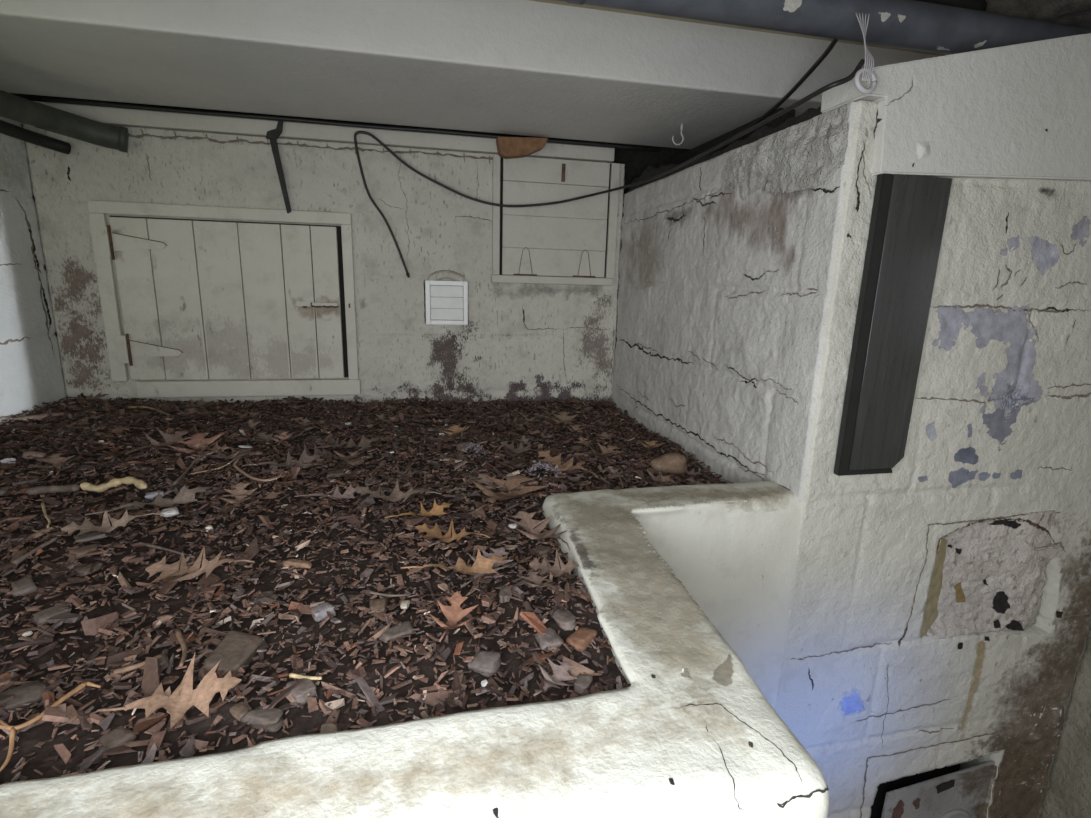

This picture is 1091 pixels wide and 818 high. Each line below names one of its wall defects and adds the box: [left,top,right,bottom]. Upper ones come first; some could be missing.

peeling [783,0,802,12]
peeling [879,12,906,23]
crack [626,167,733,254]
crack [811,77,913,238]
crack [0,189,54,356]
water stain [49,257,110,394]
water stain [353,294,615,405]
crack [521,305,798,490]
peeling [932,304,1050,488]
crack [672,703,829,810]
water stain [991,737,1060,818]